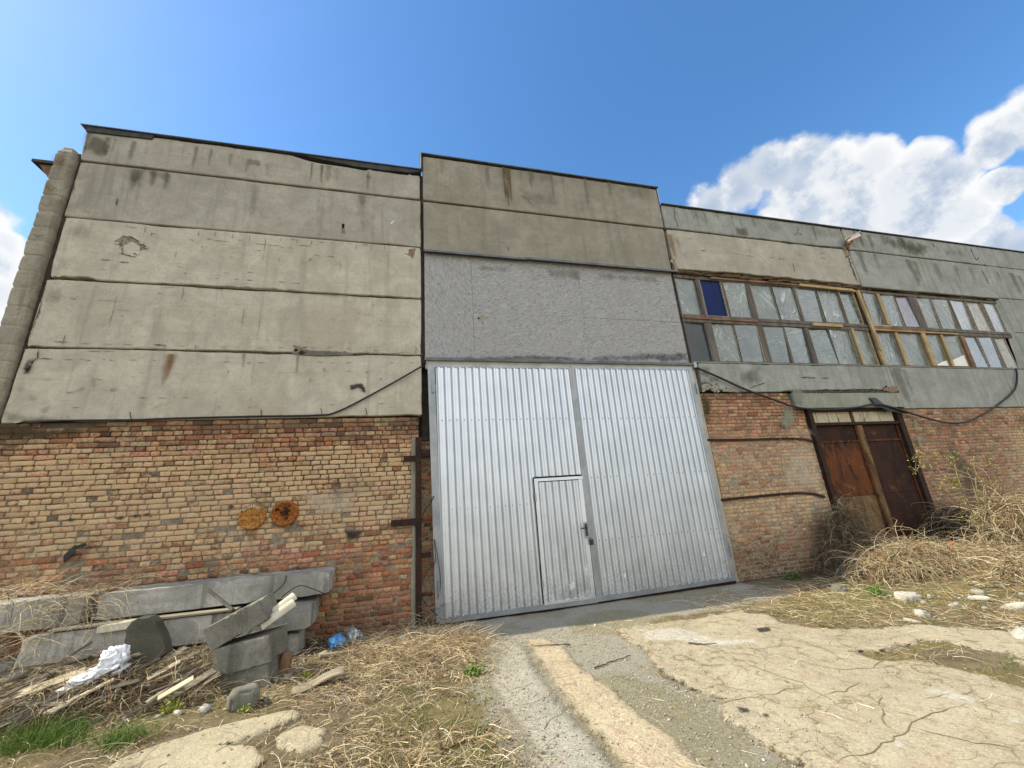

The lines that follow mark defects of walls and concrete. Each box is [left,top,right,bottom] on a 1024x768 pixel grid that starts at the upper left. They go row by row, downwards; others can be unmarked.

spalling [114,225,154,263]